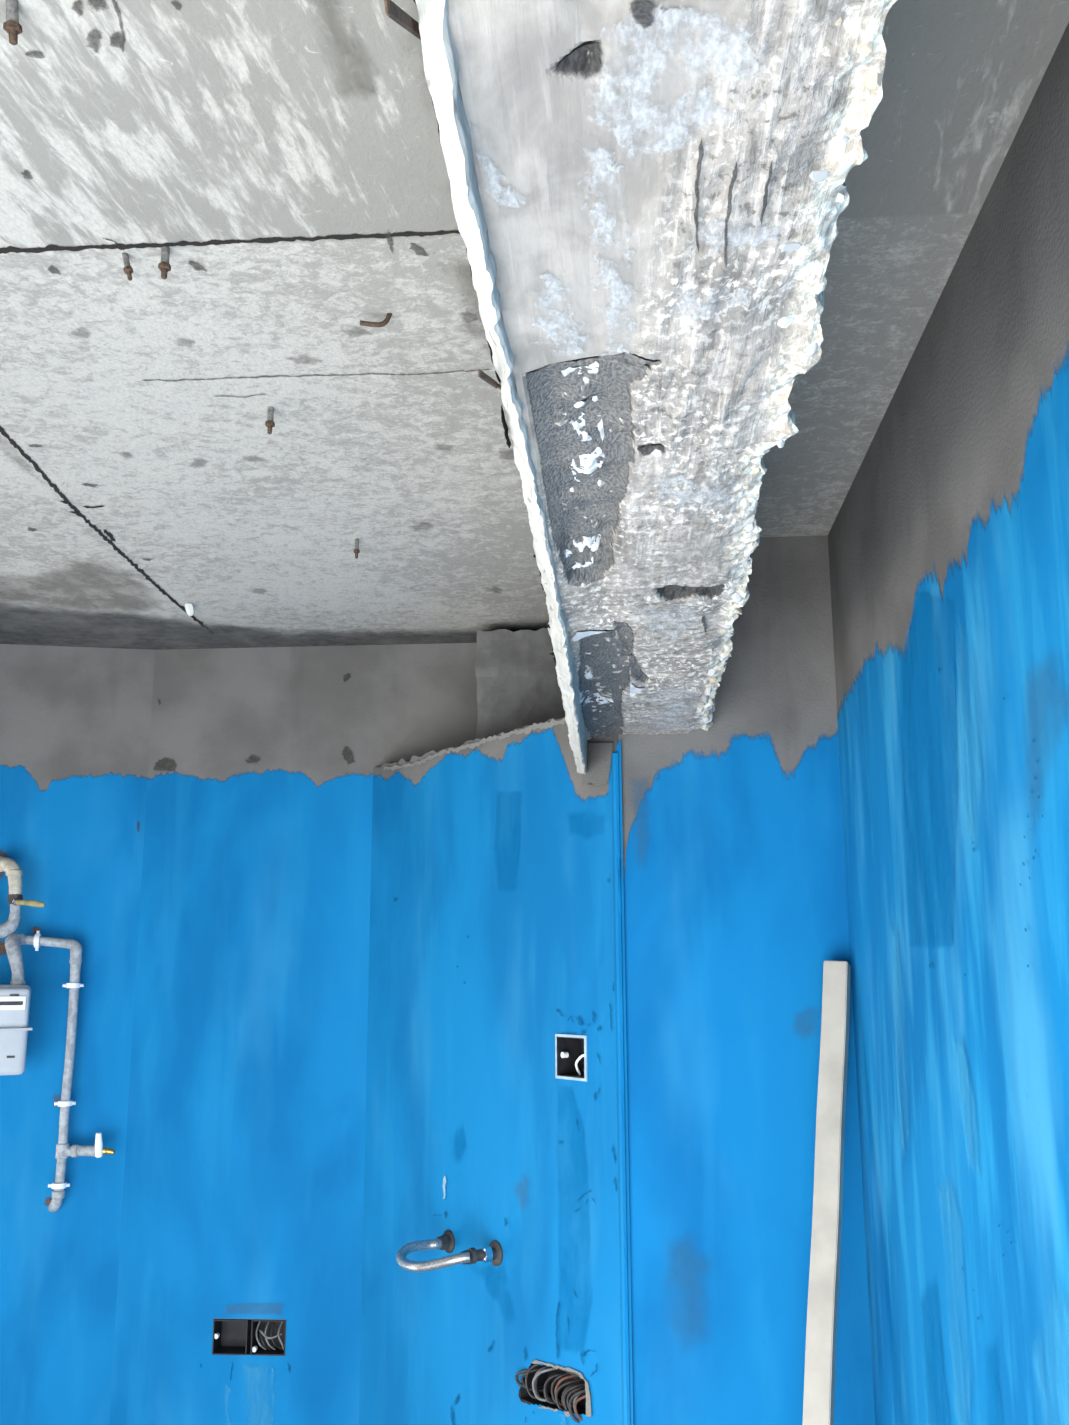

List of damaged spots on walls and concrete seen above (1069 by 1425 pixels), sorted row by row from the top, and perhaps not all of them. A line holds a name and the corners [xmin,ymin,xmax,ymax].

spalling [630,1,654,28]
spalling [555,41,602,78]
spalling [857,41,883,91]
spalling [809,170,830,182]
spalling [777,317,795,328]
spalling [775,405,791,448]
spalling [526,352,665,587]
spalling [656,457,763,723]
spalling [571,621,656,787]